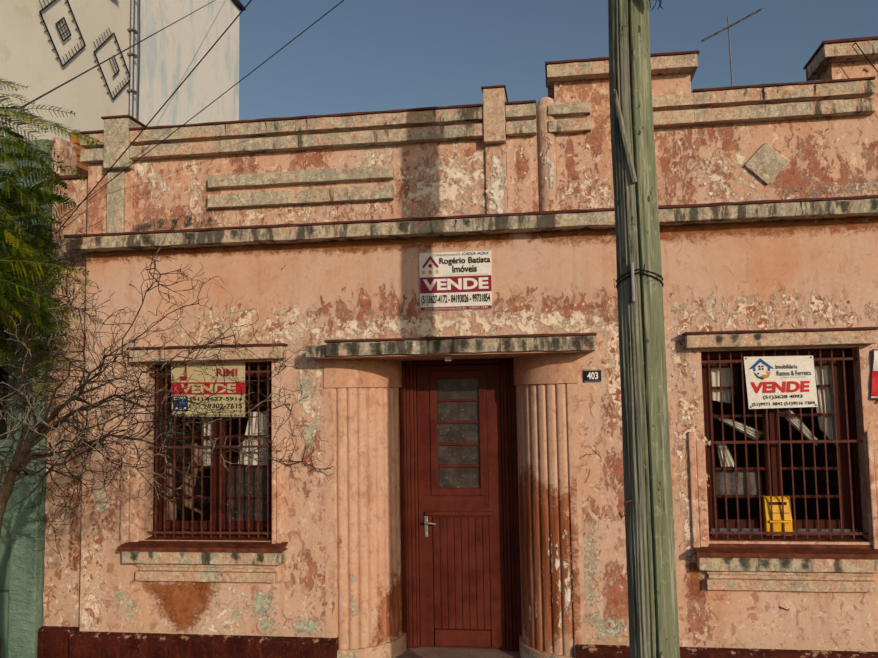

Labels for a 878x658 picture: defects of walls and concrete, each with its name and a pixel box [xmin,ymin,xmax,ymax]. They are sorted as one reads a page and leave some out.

peeling [133,137,532,231]
peeling [540,105,614,210]